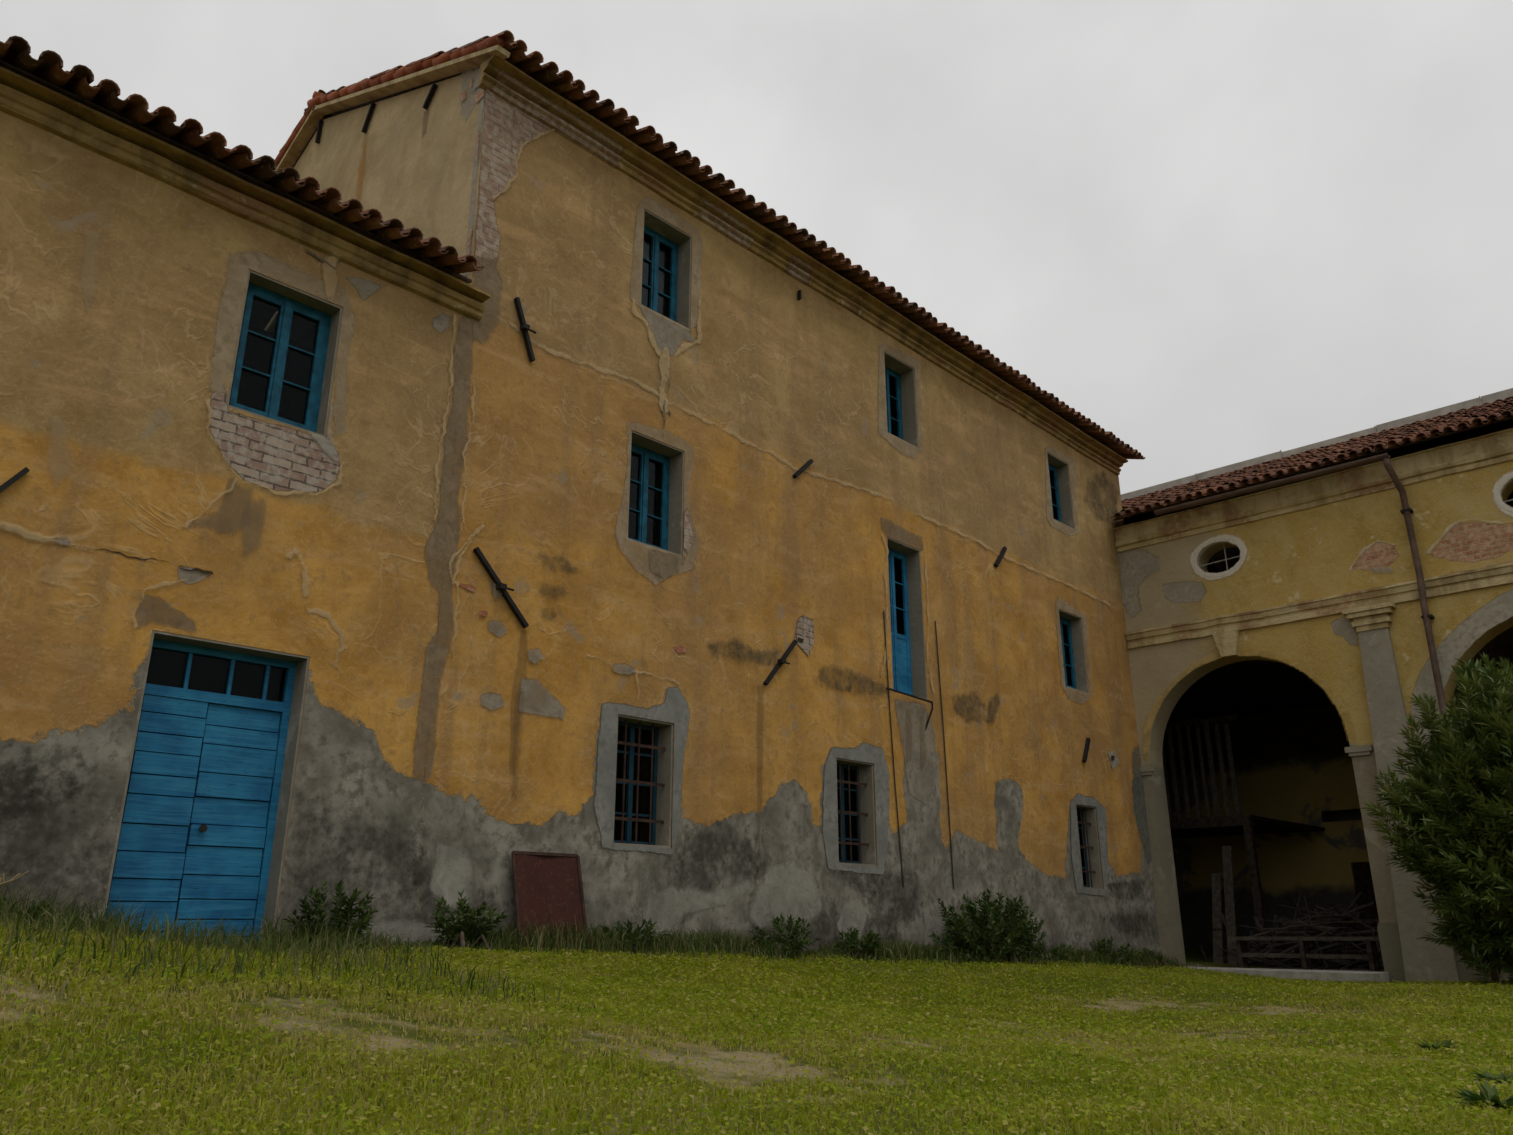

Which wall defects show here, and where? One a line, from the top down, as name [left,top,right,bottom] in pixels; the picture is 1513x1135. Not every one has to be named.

flaking render [460,67,623,343]
flaking render [206,251,382,496]
crack [0,522,193,569]
spalling [794,614,814,656]
flaking render [1411,589,1513,743]
flaking render [1427,521,1513,562]
flaking render [0,655,148,929]
flaking render [275,648,1354,956]